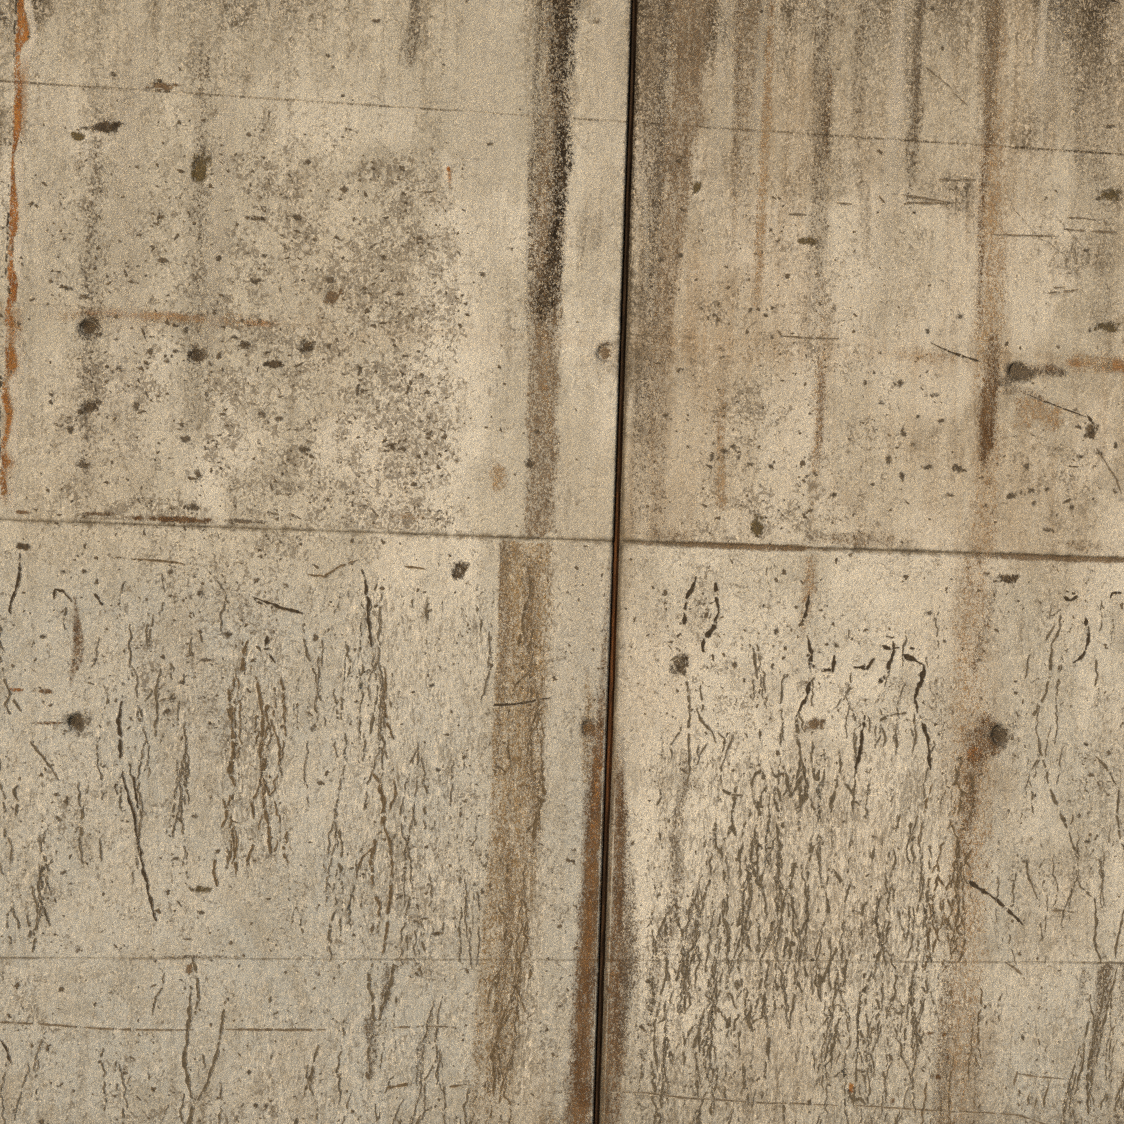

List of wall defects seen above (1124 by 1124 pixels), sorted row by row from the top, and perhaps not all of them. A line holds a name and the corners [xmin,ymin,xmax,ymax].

rust [0,0,30,499]
leakage [527,0,622,399]
leakage [631,0,893,552]
leakage [879,0,963,278]
leakage [1034,0,1119,306]
leakage [993,541,1124,564]
rust [539,586,640,1124]
crack [610,576,1124,1124]